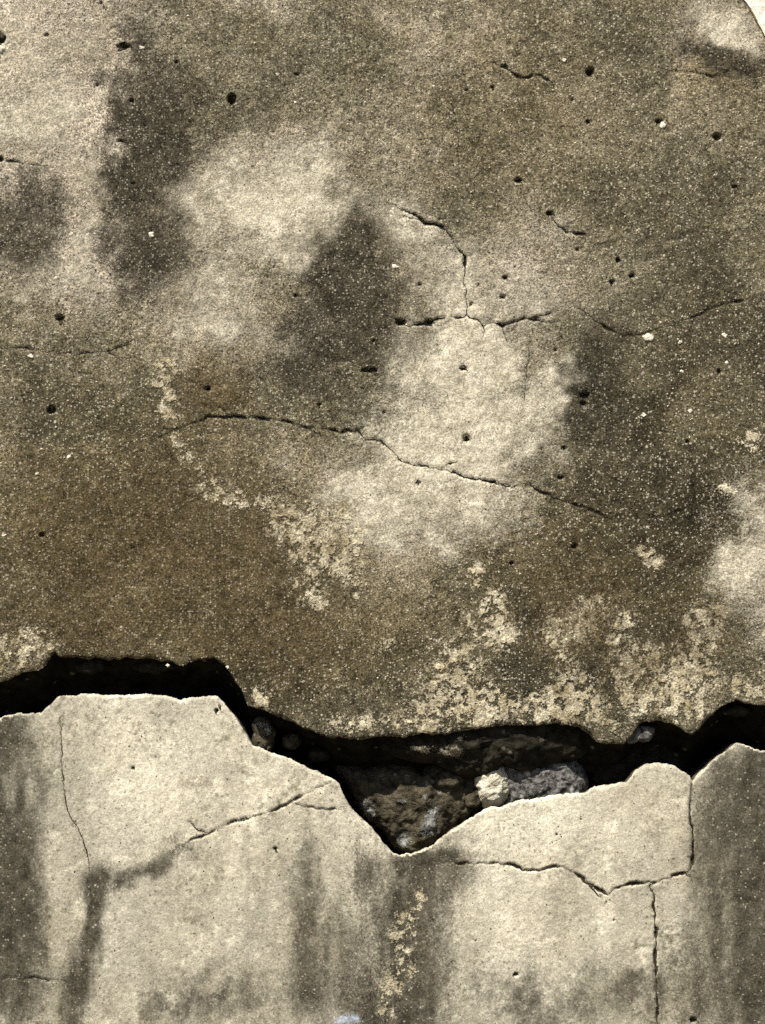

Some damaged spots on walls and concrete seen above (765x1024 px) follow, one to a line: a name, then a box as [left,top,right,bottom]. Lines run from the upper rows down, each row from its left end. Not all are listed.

damp [0,2,629,562]
crack [383,203,746,399]
crack [152,407,689,534]
crack [0,653,447,868]
spalling [215,698,254,746]
peeling [251,680,271,711]
spalling [690,743,735,781]
damp [61,853,174,1024]
crack [432,700,765,1022]